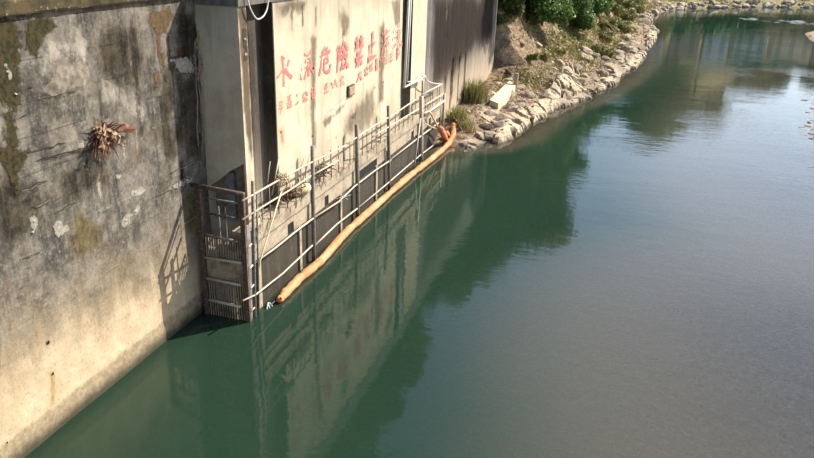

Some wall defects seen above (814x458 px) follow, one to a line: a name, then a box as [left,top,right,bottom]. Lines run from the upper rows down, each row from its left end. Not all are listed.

rust [149,5,188,88]
spalling [170,55,196,74]
damp [435,0,493,100]
damp [0,108,19,150]